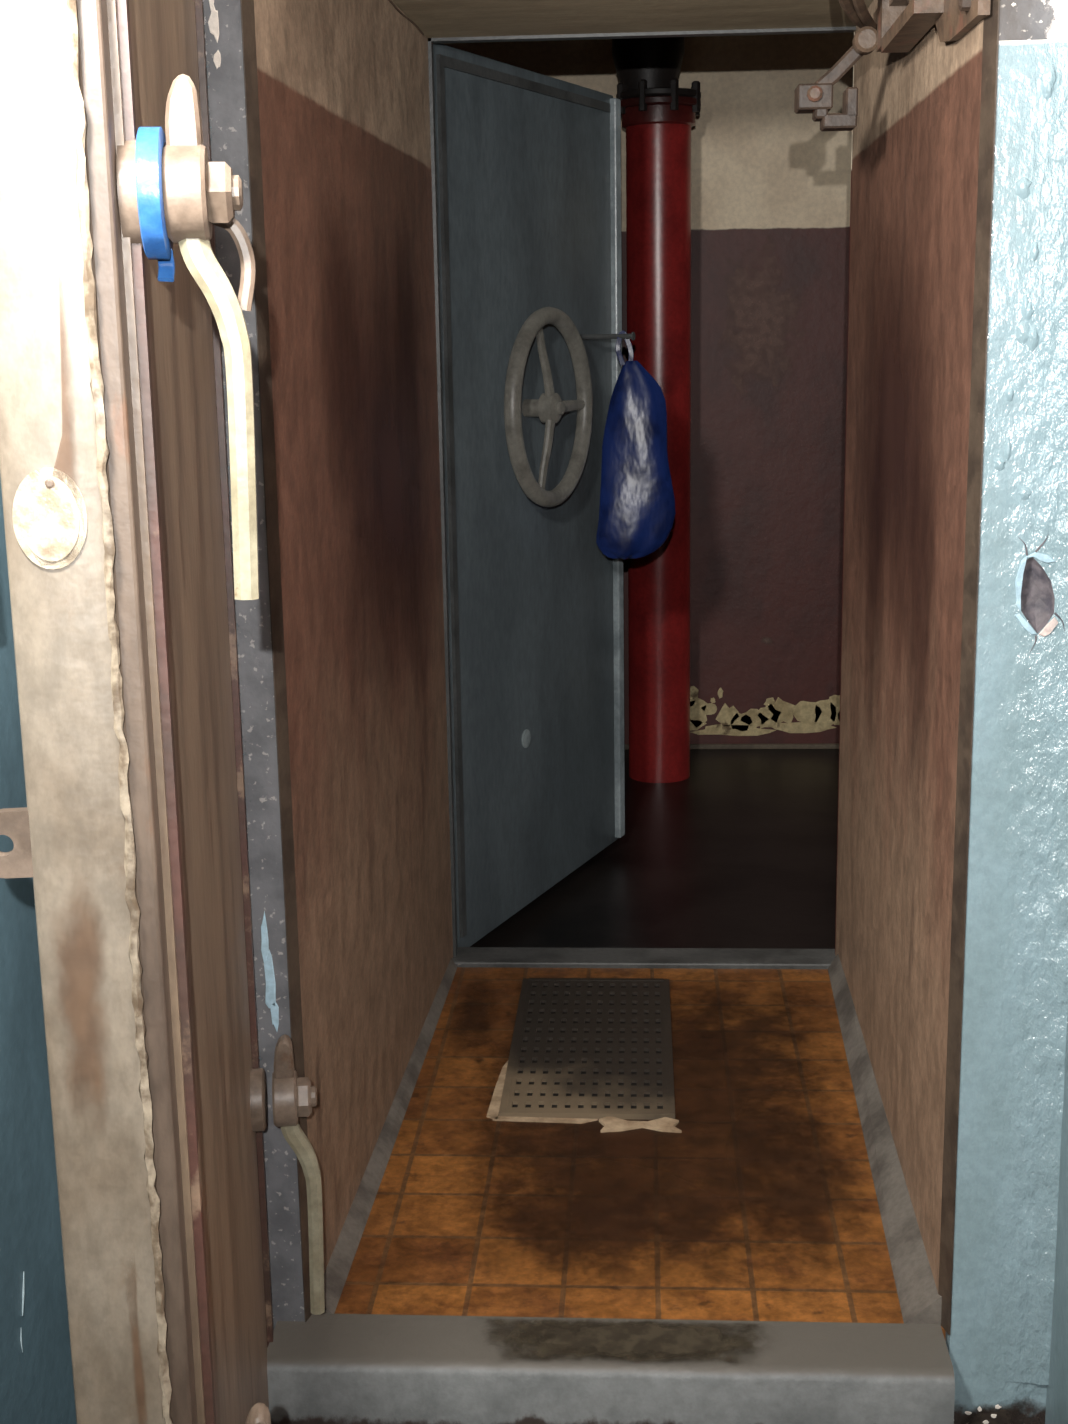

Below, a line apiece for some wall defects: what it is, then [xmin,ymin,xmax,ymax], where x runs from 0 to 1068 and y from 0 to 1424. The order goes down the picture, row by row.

hole [1015,534,1065,650]
water stain [484,994,845,1261]
water stain [521,1322,749,1357]